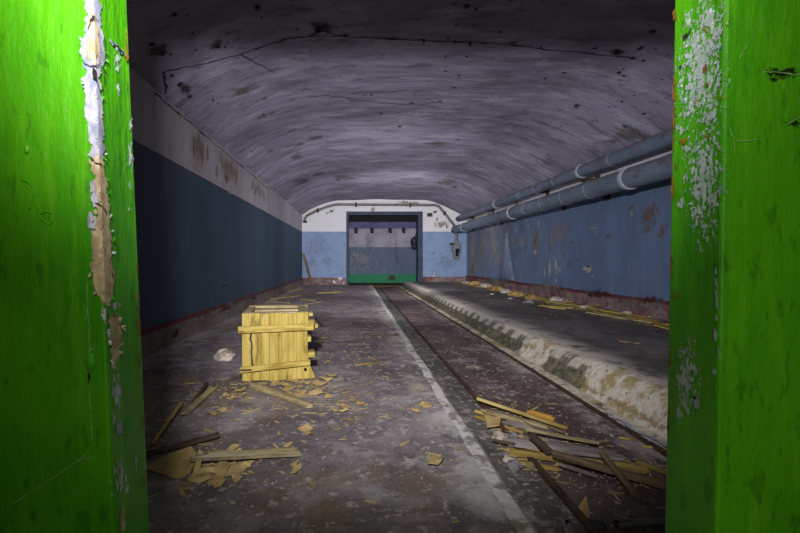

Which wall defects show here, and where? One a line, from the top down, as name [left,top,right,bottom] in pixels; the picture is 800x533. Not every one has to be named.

peeling [79,0,129,435]
crack [152,31,639,190]
peeling [675,0,732,253]
peeling [675,332,702,418]